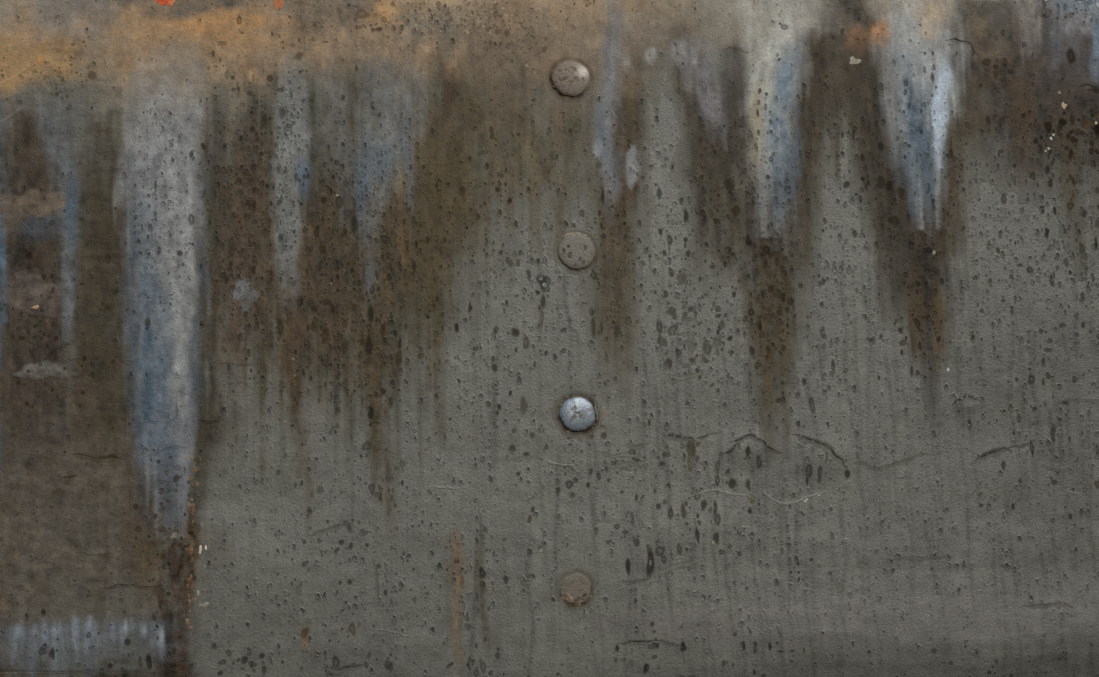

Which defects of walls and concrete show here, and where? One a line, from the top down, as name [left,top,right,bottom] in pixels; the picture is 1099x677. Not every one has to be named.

corrosion [0,7,411,632]
damp [0,0,468,558]
damp [587,0,628,229]
corrosion [309,0,1099,492]
damp [673,0,1099,252]